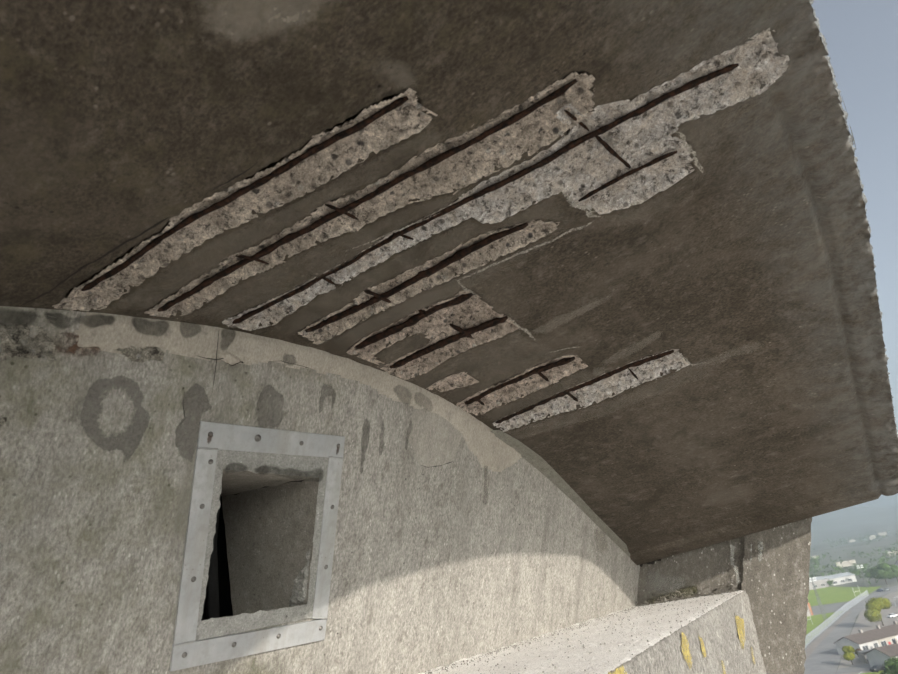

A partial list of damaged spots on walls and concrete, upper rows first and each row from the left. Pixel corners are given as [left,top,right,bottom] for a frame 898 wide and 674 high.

spalling [52,88,438,311]
spalling [145,28,790,344]
damp [0,310,115,328]
damp [132,318,168,335]
spalling [346,289,520,380]
damp [81,376,150,460]
damp [176,384,211,460]
spalling [426,349,690,432]